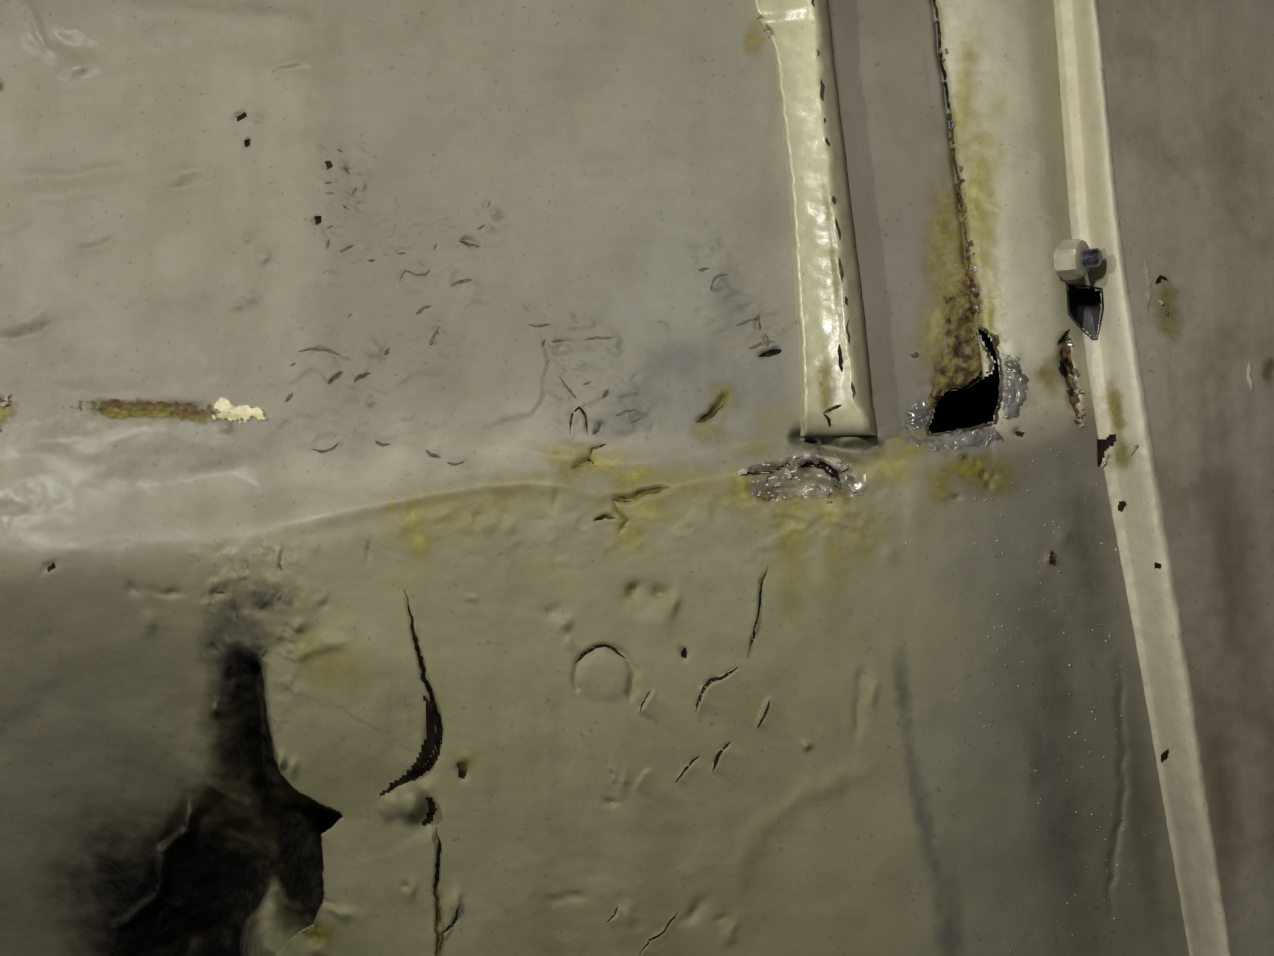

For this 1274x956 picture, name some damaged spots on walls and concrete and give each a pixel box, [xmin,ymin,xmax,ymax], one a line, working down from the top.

rust [966,140,992,289]
rust [981,300,995,337]
peeling [1058,329,1085,428]
rust [78,399,216,423]
peeling [212,398,266,421]
peeling [1097,434,1116,468]
peeling [737,448,866,503]
crack [695,570,767,712]
crack [757,699,770,728]
crack [380,591,460,951]
crack [675,742,730,782]